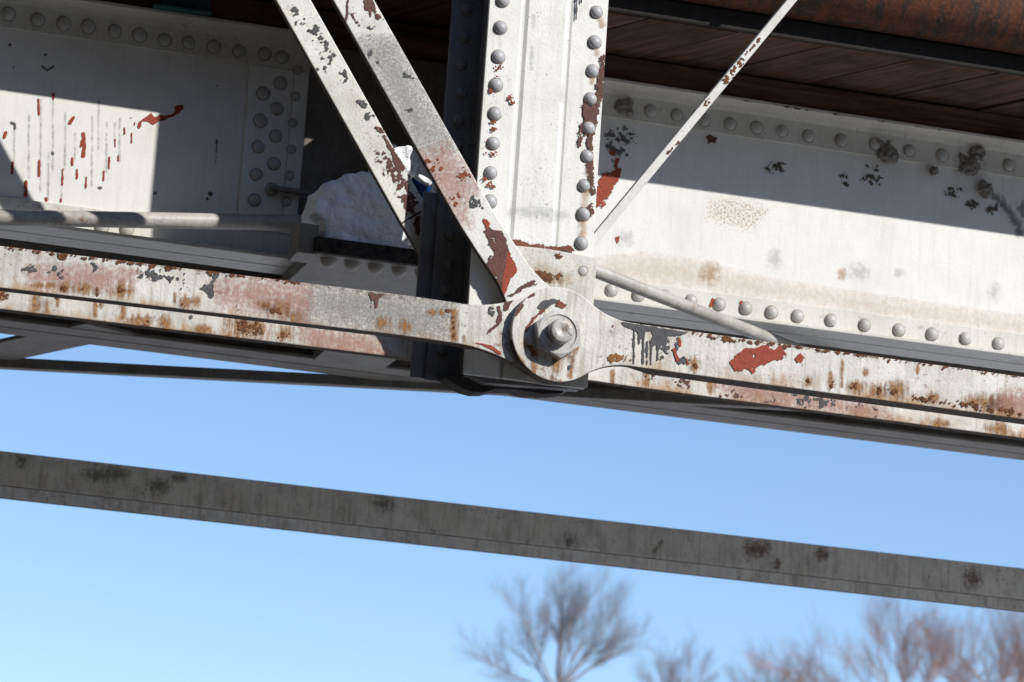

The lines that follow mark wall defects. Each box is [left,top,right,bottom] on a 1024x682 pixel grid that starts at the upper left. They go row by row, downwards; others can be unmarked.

peeling [291,6,348,83]
peeling [45,132,87,202]
peeling [103,105,184,181]
peeling [353,0,567,355]
peeling [577,54,638,217]
water stain [990,191,1024,236]
rust [32,282,103,317]
rust [112,284,170,327]
rust [227,303,300,341]
rust [431,309,465,341]
peeling [730,345,805,374]
rust [693,331,1022,435]